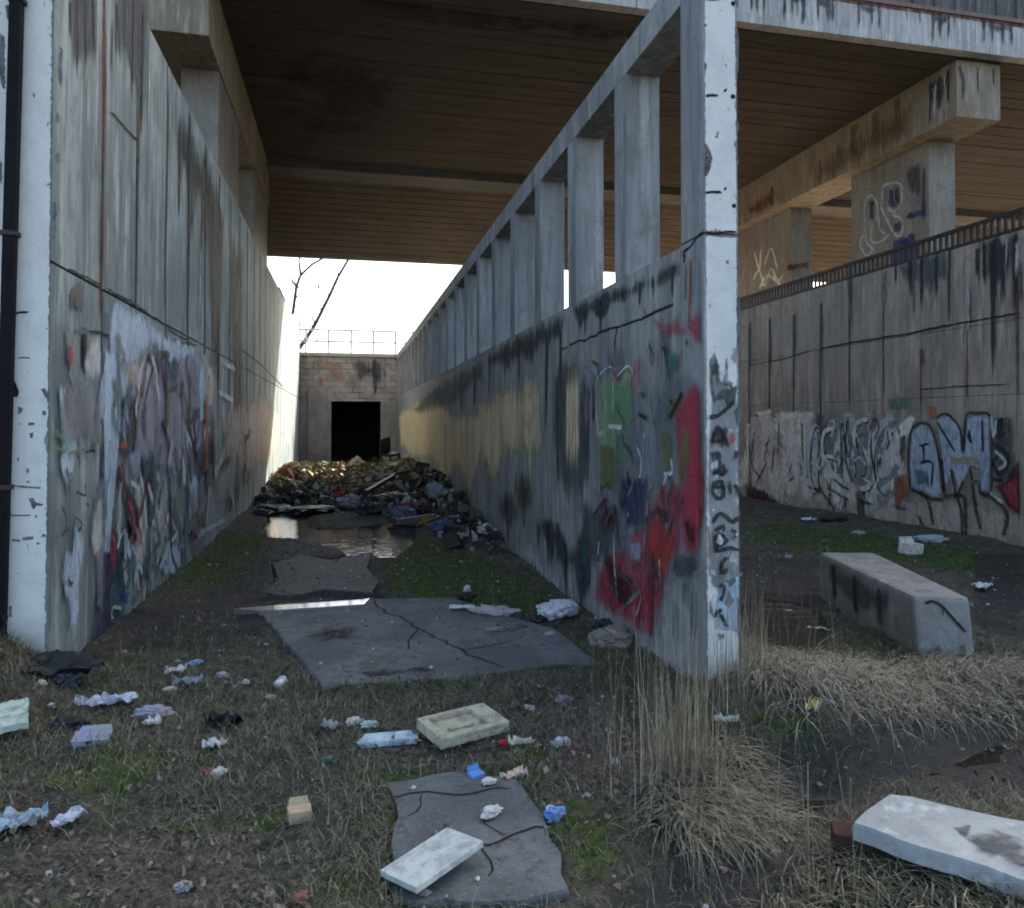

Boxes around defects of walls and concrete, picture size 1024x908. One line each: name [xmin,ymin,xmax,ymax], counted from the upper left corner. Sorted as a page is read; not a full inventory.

rust [99,0,107,311]
crack [561,303,673,354]
damp [575,265,676,332]
damp [966,233,1019,367]
damp [357,360,386,394]
crack [373,600,508,667]
crack [926,600,966,633]
crack [391,787,510,816]
crack [481,819,544,876]